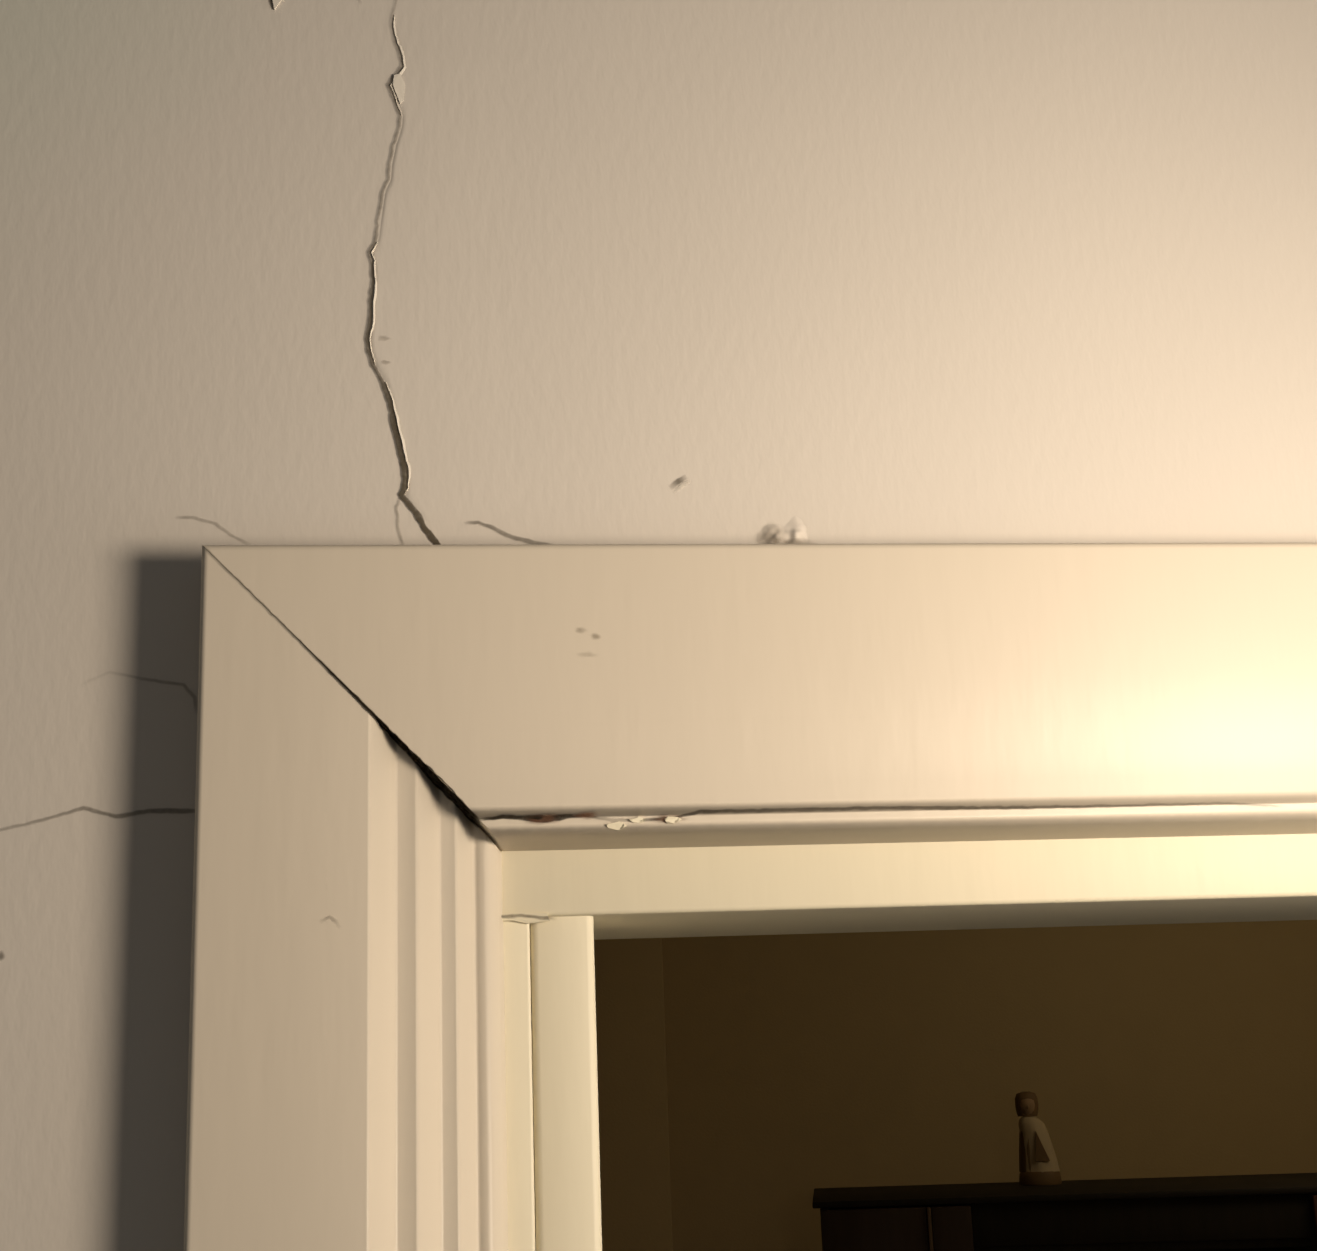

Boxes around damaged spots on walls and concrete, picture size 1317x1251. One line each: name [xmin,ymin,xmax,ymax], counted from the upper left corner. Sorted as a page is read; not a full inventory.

crack [365,15,441,545]